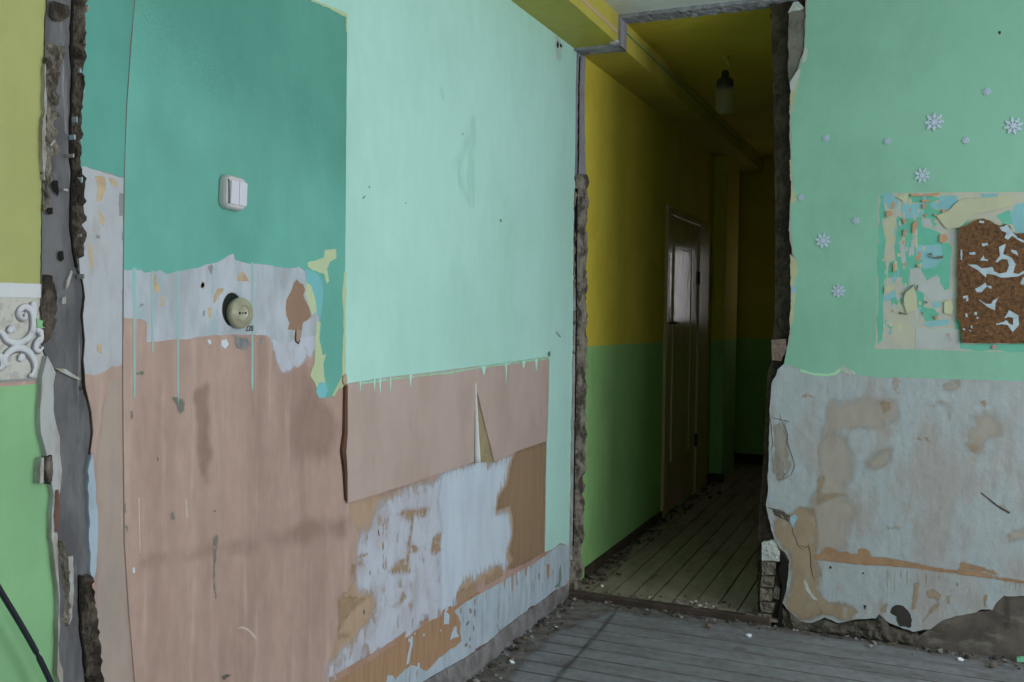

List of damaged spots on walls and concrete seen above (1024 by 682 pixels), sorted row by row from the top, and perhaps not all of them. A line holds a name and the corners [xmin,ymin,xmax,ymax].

spalling [33,0,347,682]
water stain [171,379,214,486]
flaking render [326,0,1024,682]
crack [770,416,795,479]